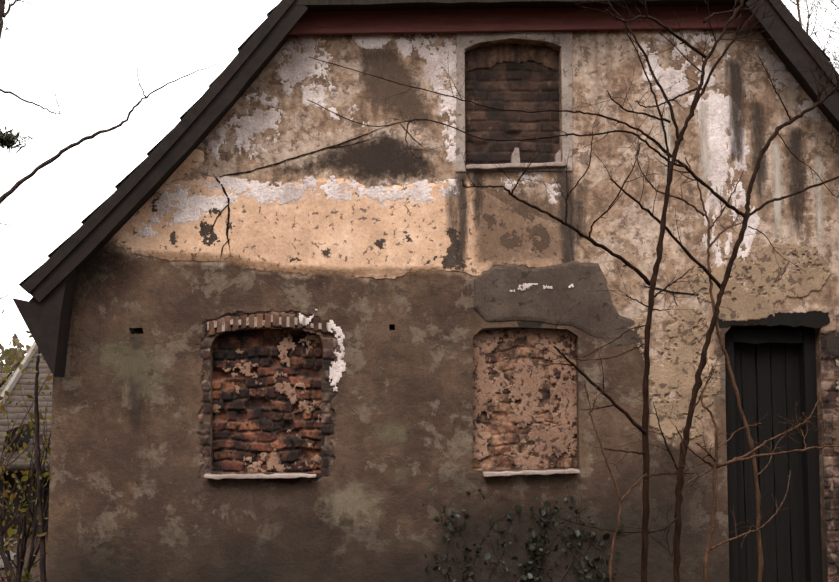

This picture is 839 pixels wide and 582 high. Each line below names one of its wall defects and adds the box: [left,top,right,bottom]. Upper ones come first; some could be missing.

crack [209,123,425,259]
flaking render [111,33,565,279]
water stain [280,132,433,183]
water stain [362,49,432,130]
water stain [726,59,807,229]
flaking render [820,331,839,582]